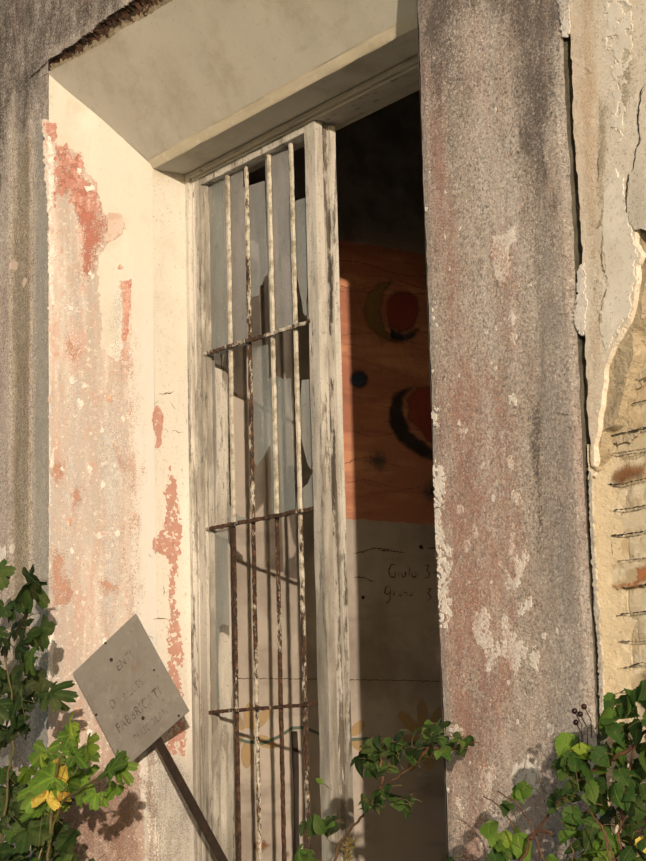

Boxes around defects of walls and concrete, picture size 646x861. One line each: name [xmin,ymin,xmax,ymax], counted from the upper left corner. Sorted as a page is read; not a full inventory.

peeling [603,0,633,142]
crack [622,83,645,213]
flaking render [573,263,588,336]
peeling [596,168,638,350]
peeling [41,119,146,861]
peeling [152,405,164,448]
peeling [152,465,184,698]
peeling [433,460,446,548]
peeling [490,522,529,595]
peeling [472,596,559,685]
flaking render [588,467,605,716]
peeling [165,716,187,756]